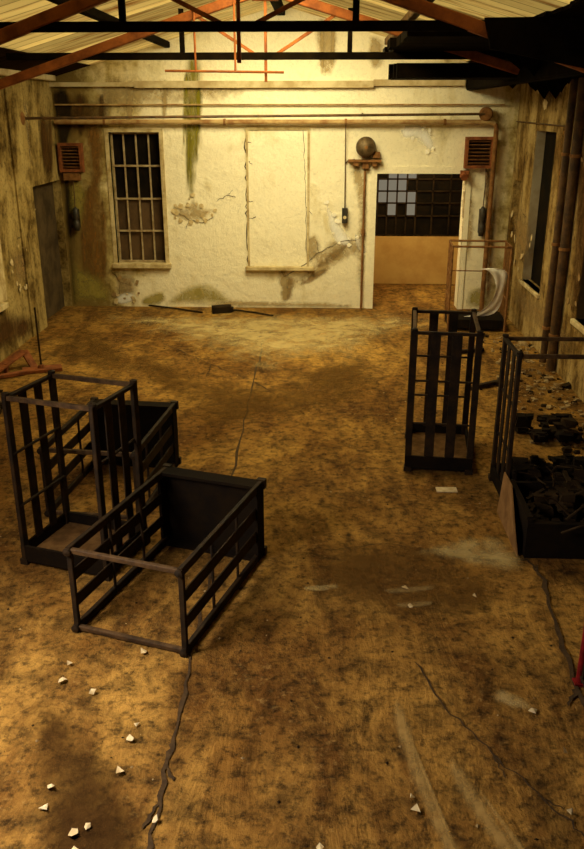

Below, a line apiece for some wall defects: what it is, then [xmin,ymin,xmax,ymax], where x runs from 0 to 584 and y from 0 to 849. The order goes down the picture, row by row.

leakage [100,74,226,177]
peeling [171,193,217,226]
crack [159,323,270,476]
crack [141,612,202,849]
crack [415,662,584,837]